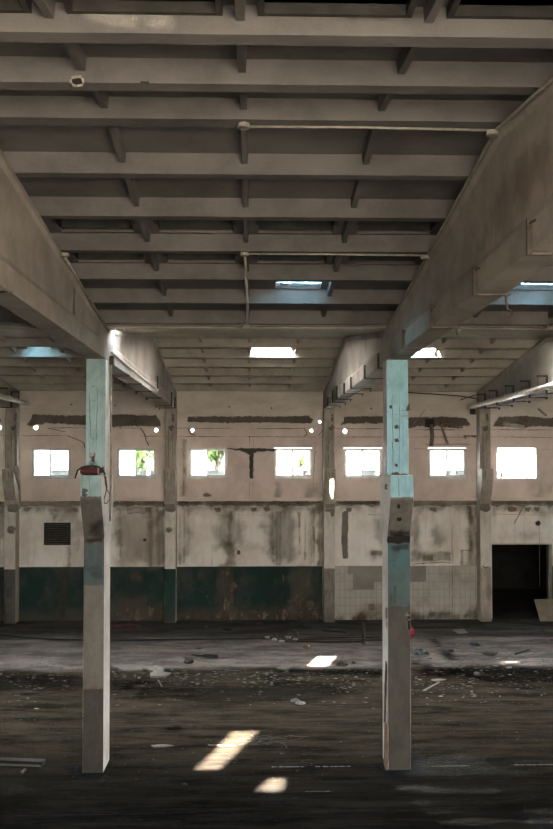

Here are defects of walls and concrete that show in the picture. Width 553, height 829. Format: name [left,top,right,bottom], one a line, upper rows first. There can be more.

spalling [27,414,86,430]
spalling [112,405,175,433]
spalling [394,404,553,442]
damp [313,532,323,566]
spalling [387,535,411,544]